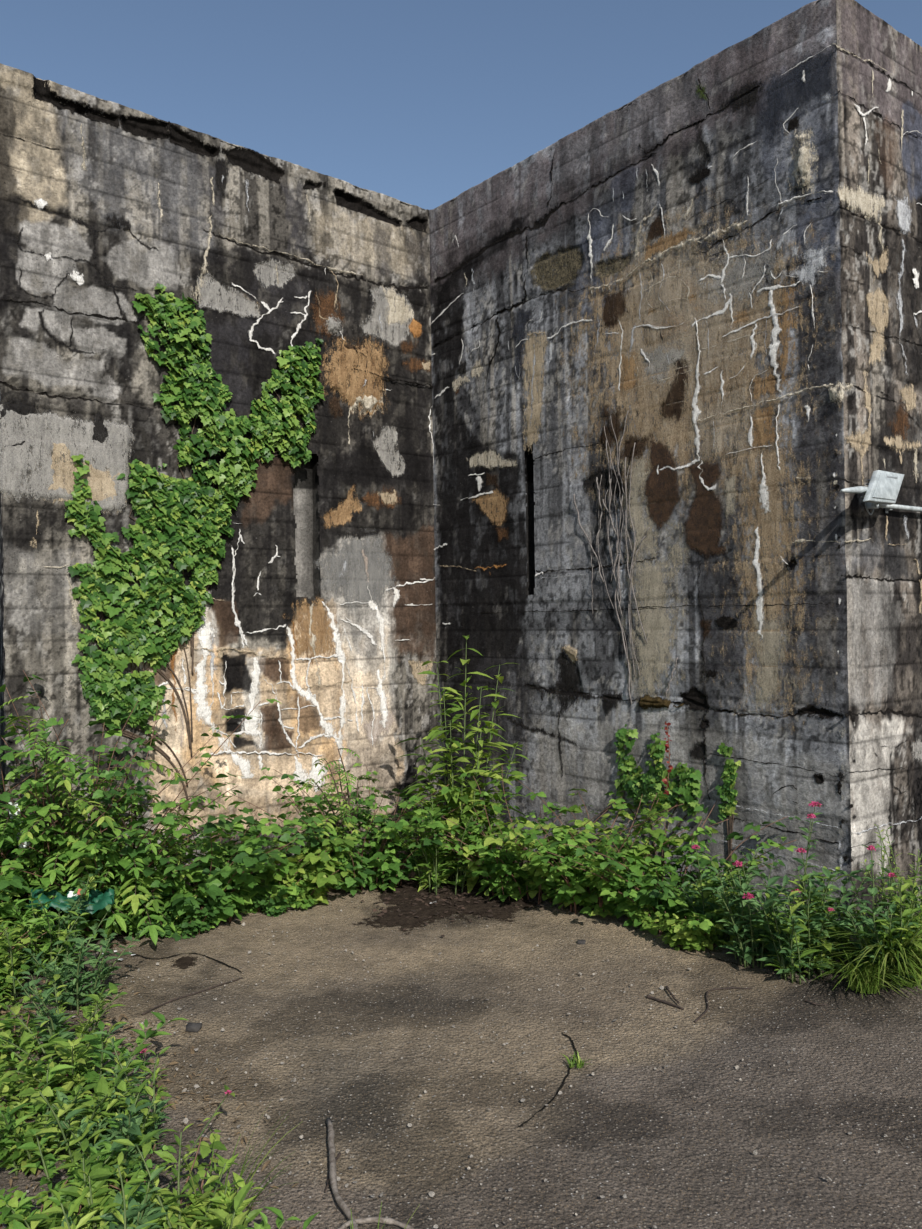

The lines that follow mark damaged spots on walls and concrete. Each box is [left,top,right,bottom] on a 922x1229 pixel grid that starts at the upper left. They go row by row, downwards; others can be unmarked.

damp [718,40,840,141]
crack [204,43,922,463]
spalling [530,216,695,293]
flaking render [0,396,135,513]
spalling [461,449,517,540]
damp [508,70,922,731]
damp [167,530,395,792]